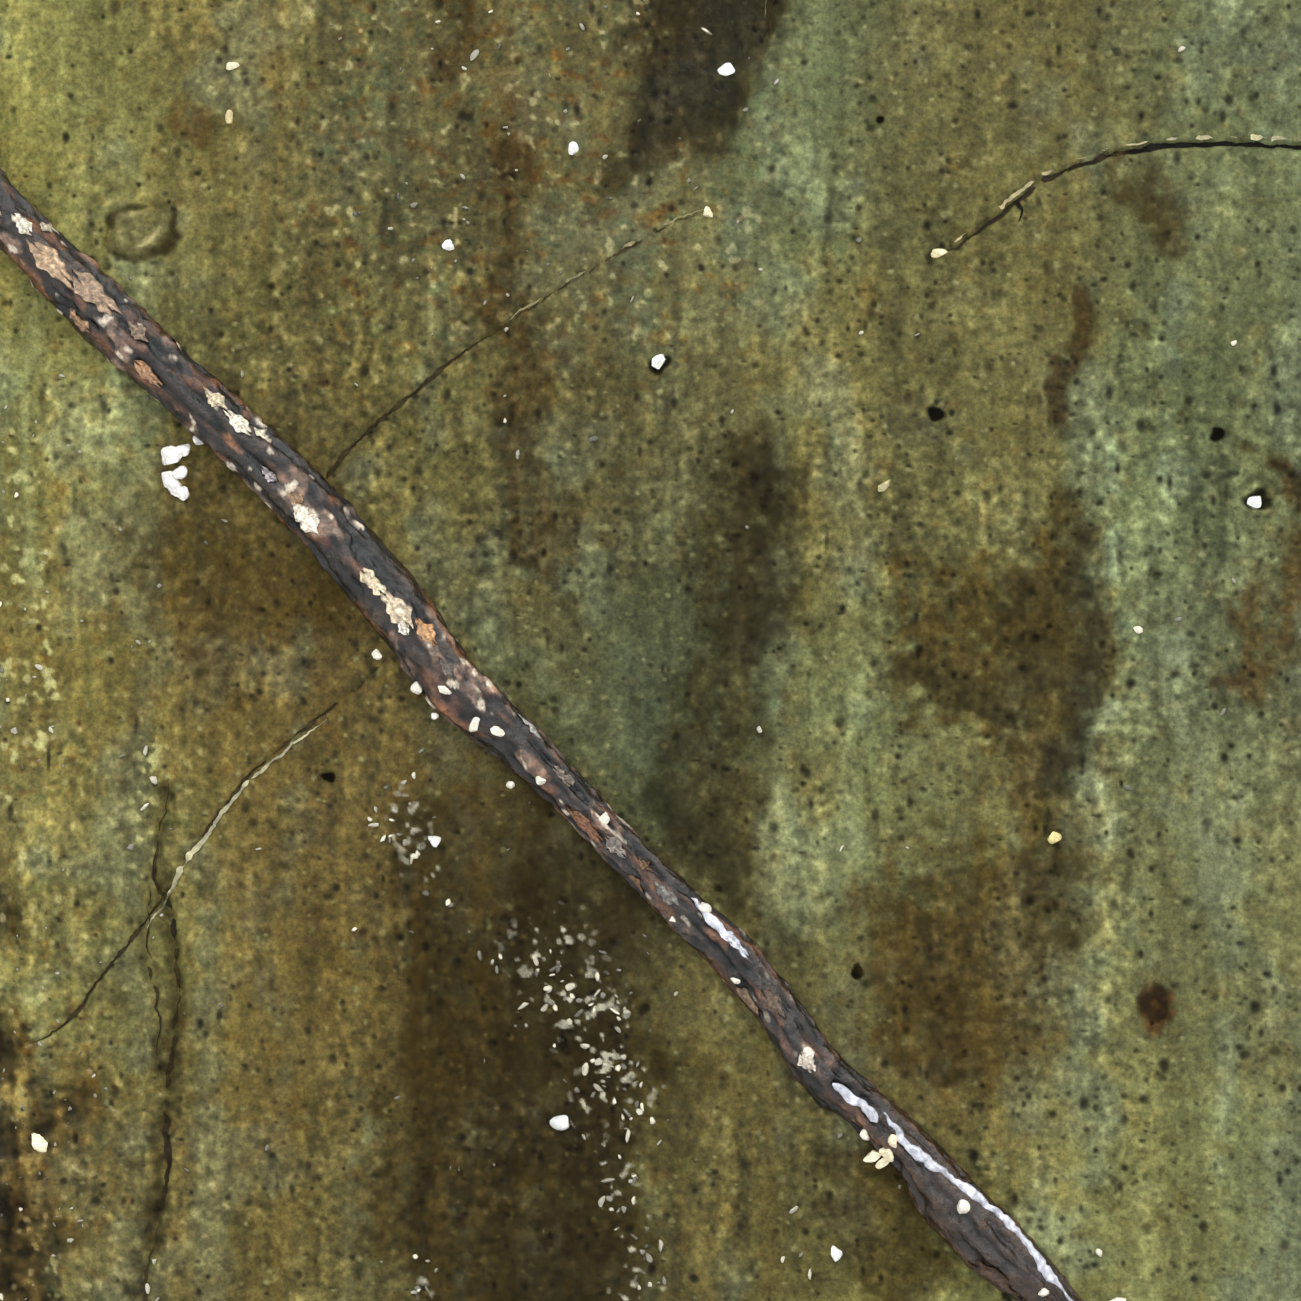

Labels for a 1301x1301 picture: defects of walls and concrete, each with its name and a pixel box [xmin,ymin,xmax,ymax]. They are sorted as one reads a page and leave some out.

water stain [599,0,788,194]
crack [946,134,1301,251]
rust [1107,152,1182,256]
rust [1044,285,1092,424]
water stain [645,443,810,954]
water stain [847,498,1116,1091]
crack [29,658,386,1301]
rust [1139,985,1174,1035]